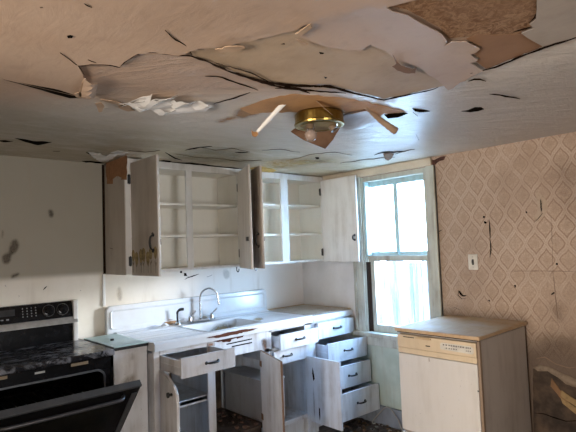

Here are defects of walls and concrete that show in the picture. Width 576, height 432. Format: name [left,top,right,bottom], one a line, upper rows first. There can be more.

crack [60,30,438,115]
peeling [0,0,576,149]
crack [468,37,576,82]
crack [7,80,77,98]
crack [463,105,484,113]
peeling [106,156,127,184]
crack [161,146,239,169]
rust [208,318,262,346]
peeling [533,357,576,432]